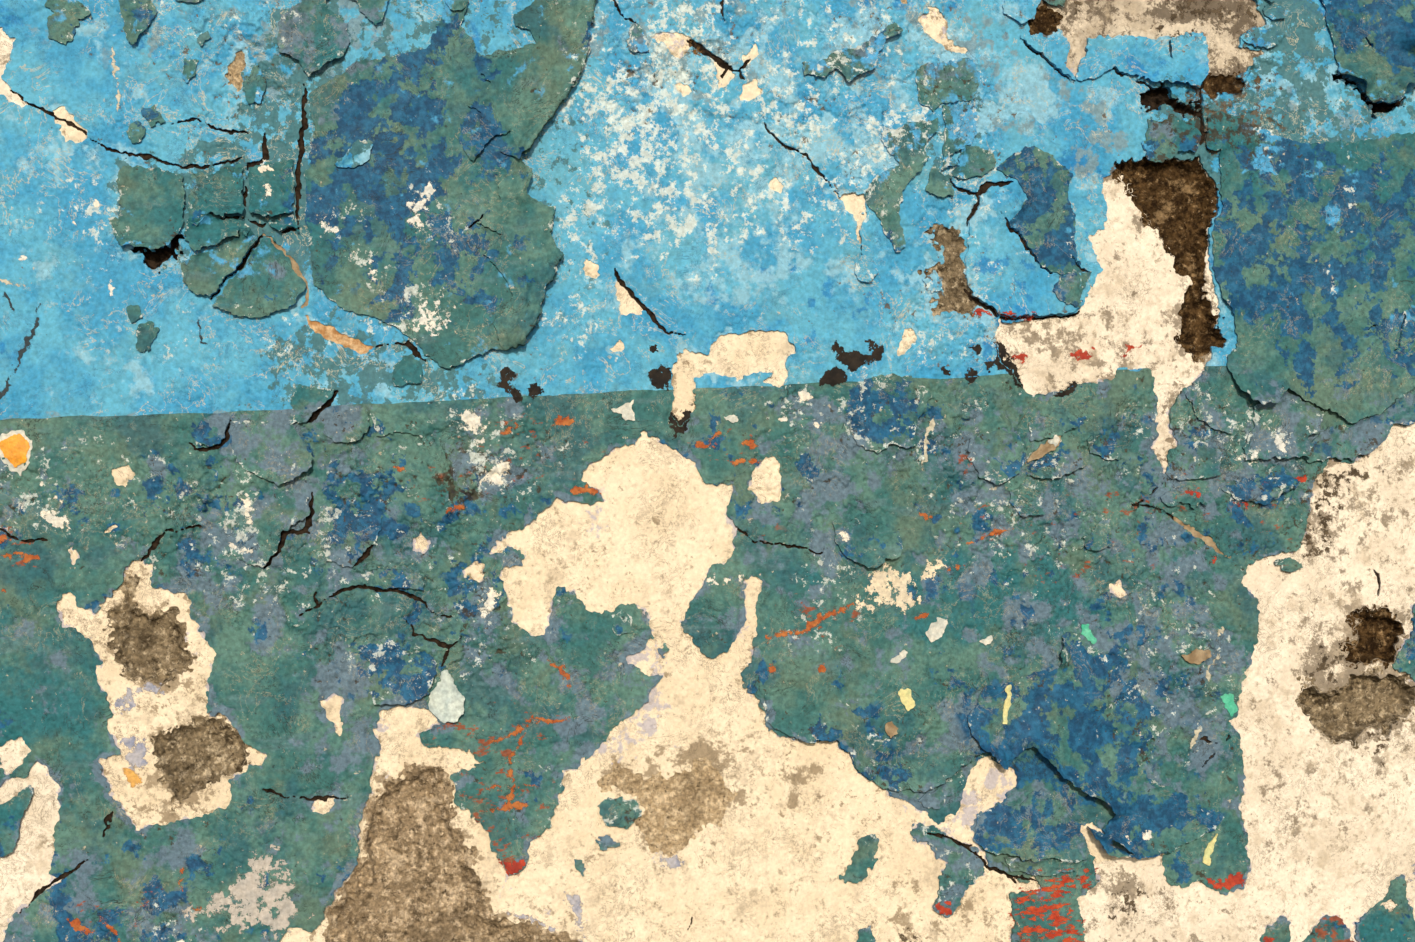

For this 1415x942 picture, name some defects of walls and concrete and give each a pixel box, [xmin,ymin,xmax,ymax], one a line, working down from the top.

flaking render [0,27,28,108]
crack [10,84,309,308]
crack [764,124,831,187]
flaking render [915,0,1415,942]
flaking render [56,558,267,831]
flaking render [279,430,1087,942]
flaking render [0,737,61,942]